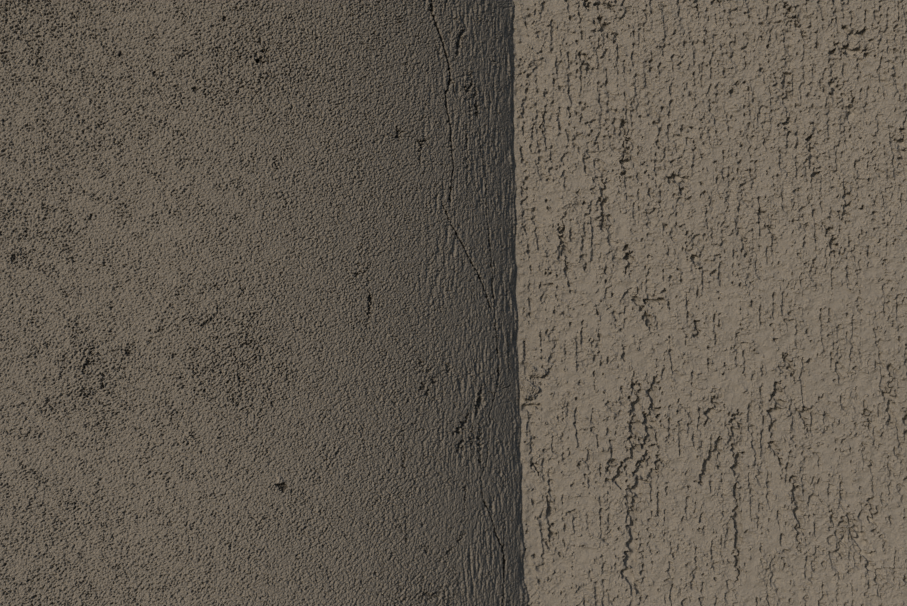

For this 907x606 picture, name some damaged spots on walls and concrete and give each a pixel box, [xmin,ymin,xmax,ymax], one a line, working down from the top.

crack [429,0,510,606]